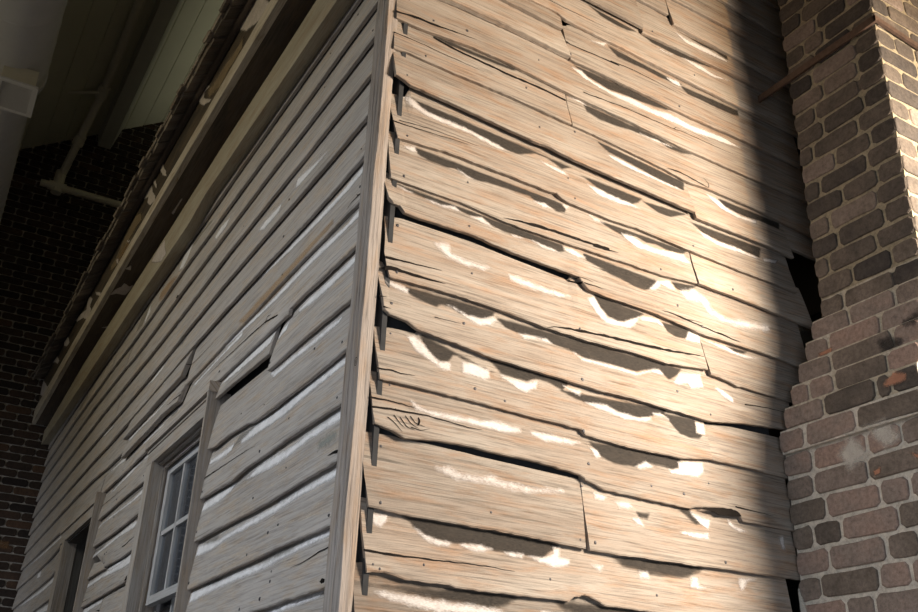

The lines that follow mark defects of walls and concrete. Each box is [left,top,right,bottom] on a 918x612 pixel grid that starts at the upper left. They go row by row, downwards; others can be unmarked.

peeling [199,0,269,105]
peeling [144,164,166,205]
peeling [152,240,166,262]
crack [506,218,618,253]
crack [568,277,602,289]
peeling [75,283,133,321]
crack [186,314,277,372]
crack [543,326,704,357]
crack [665,311,737,341]